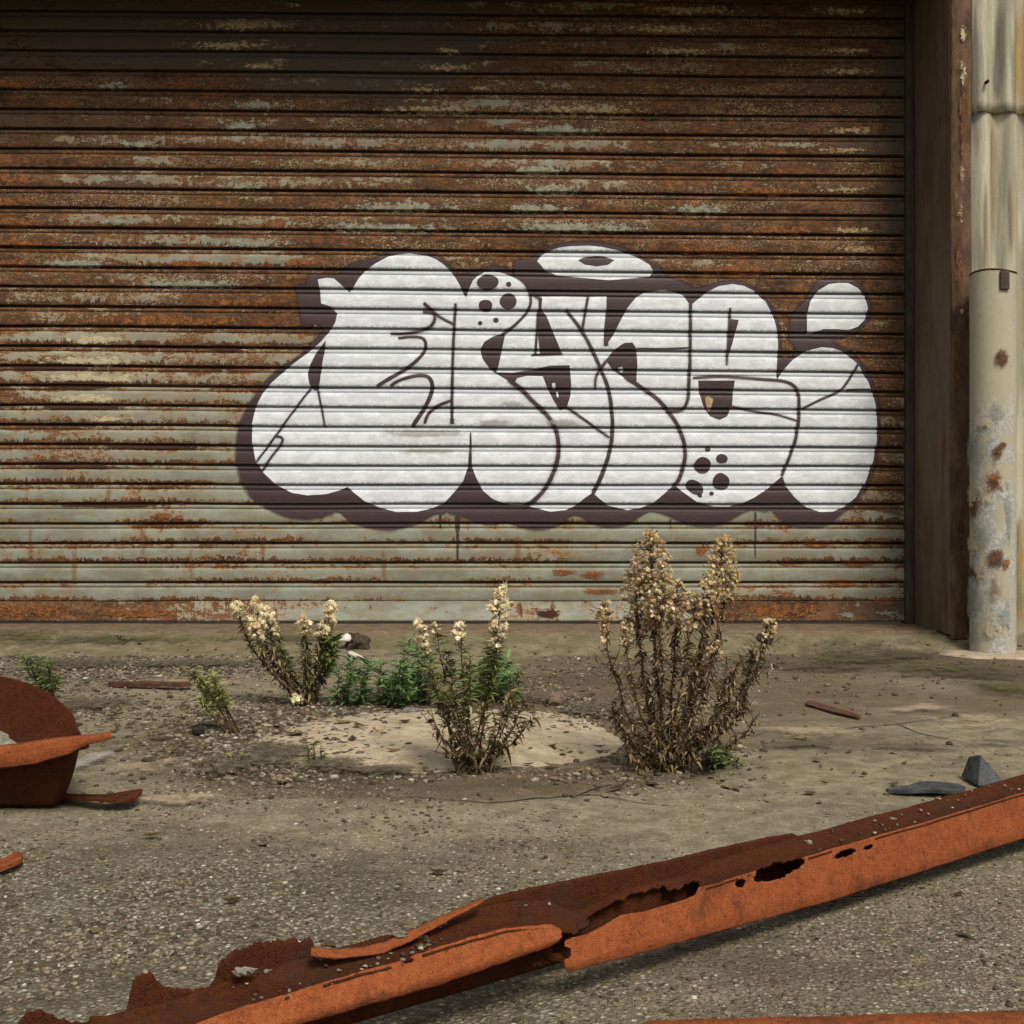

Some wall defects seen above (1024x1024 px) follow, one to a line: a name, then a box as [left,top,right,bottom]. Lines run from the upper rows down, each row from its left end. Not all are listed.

peeling [223,99,282,132]
peeling [373,87,658,136]
peeling [495,164,653,234]
corrosion [0,197,58,268]
peeling [201,238,292,249]
peeling [319,202,464,234]
corrosion [664,245,781,276]
peeling [29,335,155,402]
corrosion [994,349,1009,367]
corrosion [985,442,1007,491]
corrosion [838,559,872,567]
corrosion [552,569,623,594]